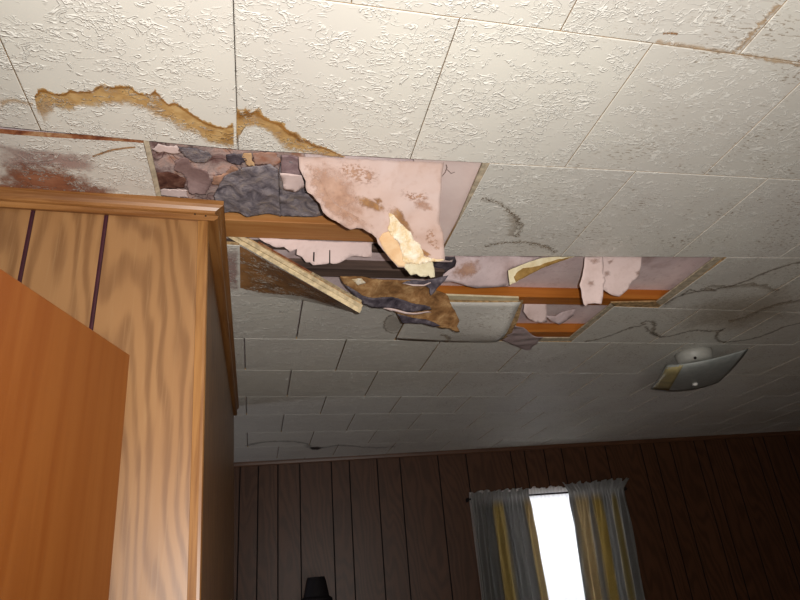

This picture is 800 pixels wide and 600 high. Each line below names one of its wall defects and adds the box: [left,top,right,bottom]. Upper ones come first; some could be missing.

leakage [0,84,345,157]
leakage [0,151,107,194]
flaking render [152,144,305,198]